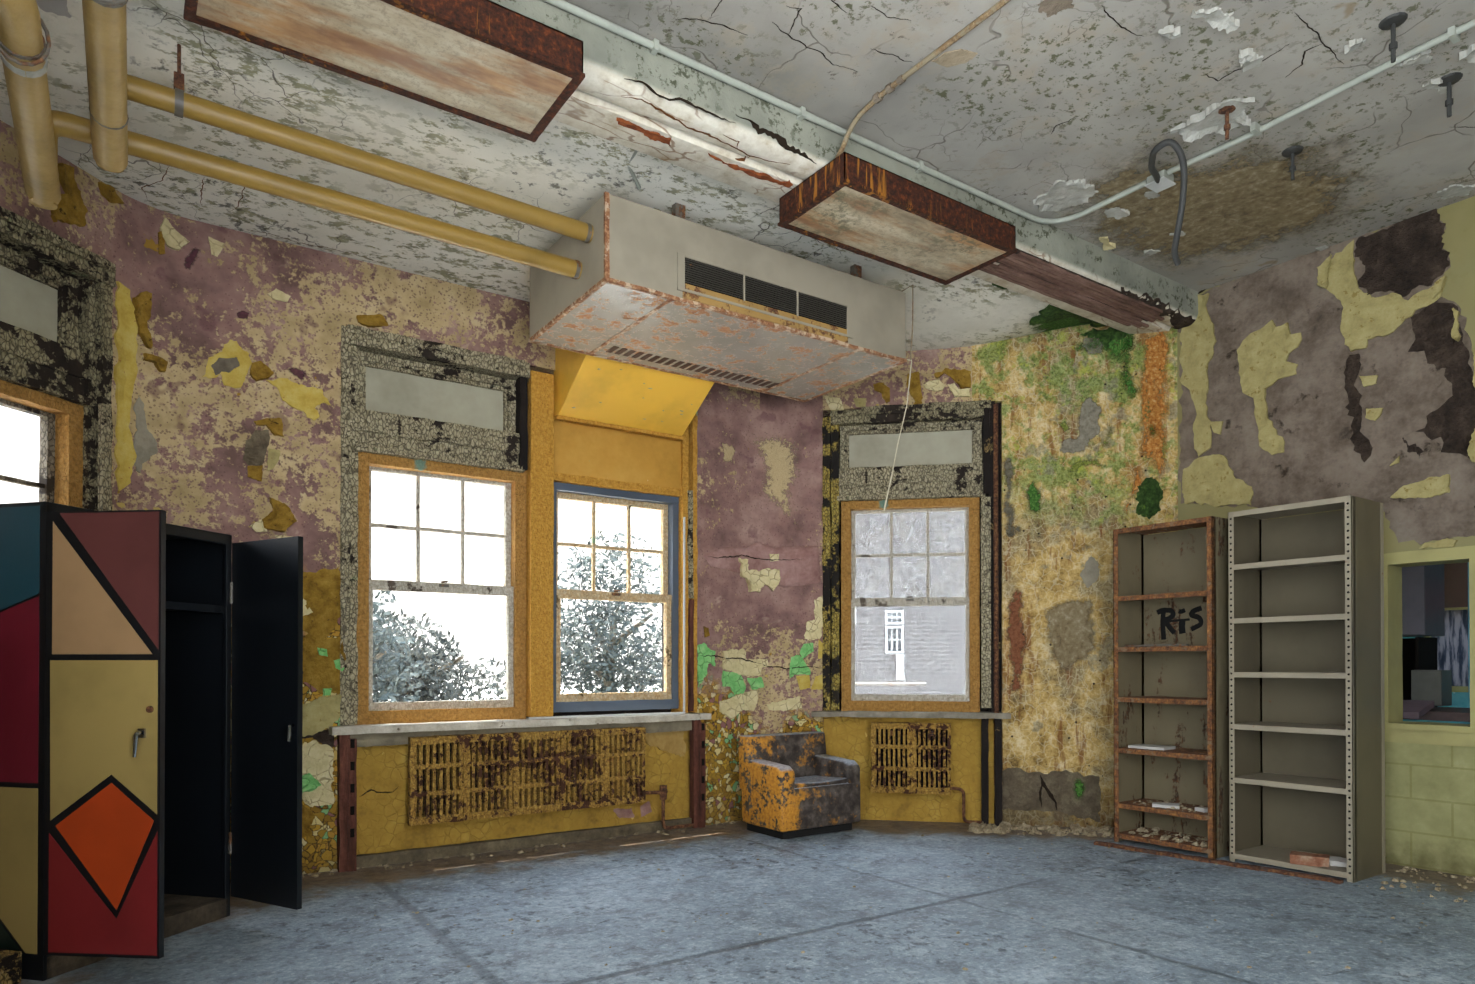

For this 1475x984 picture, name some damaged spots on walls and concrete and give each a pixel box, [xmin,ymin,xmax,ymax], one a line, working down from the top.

crack [1103,6,1142,36]
crack [1205,12,1344,81]
rust [617,117,671,146]
crack [624,78,816,165]
rust [708,153,793,188]
peeling [1170,97,1255,142]
damp [1079,142,1364,261]
peeling [113,281,168,491]
rust [1126,331,1169,512]
peeling [1121,184,1475,549]
damp [1003,458,1020,537]
peeling [697,596,823,720]